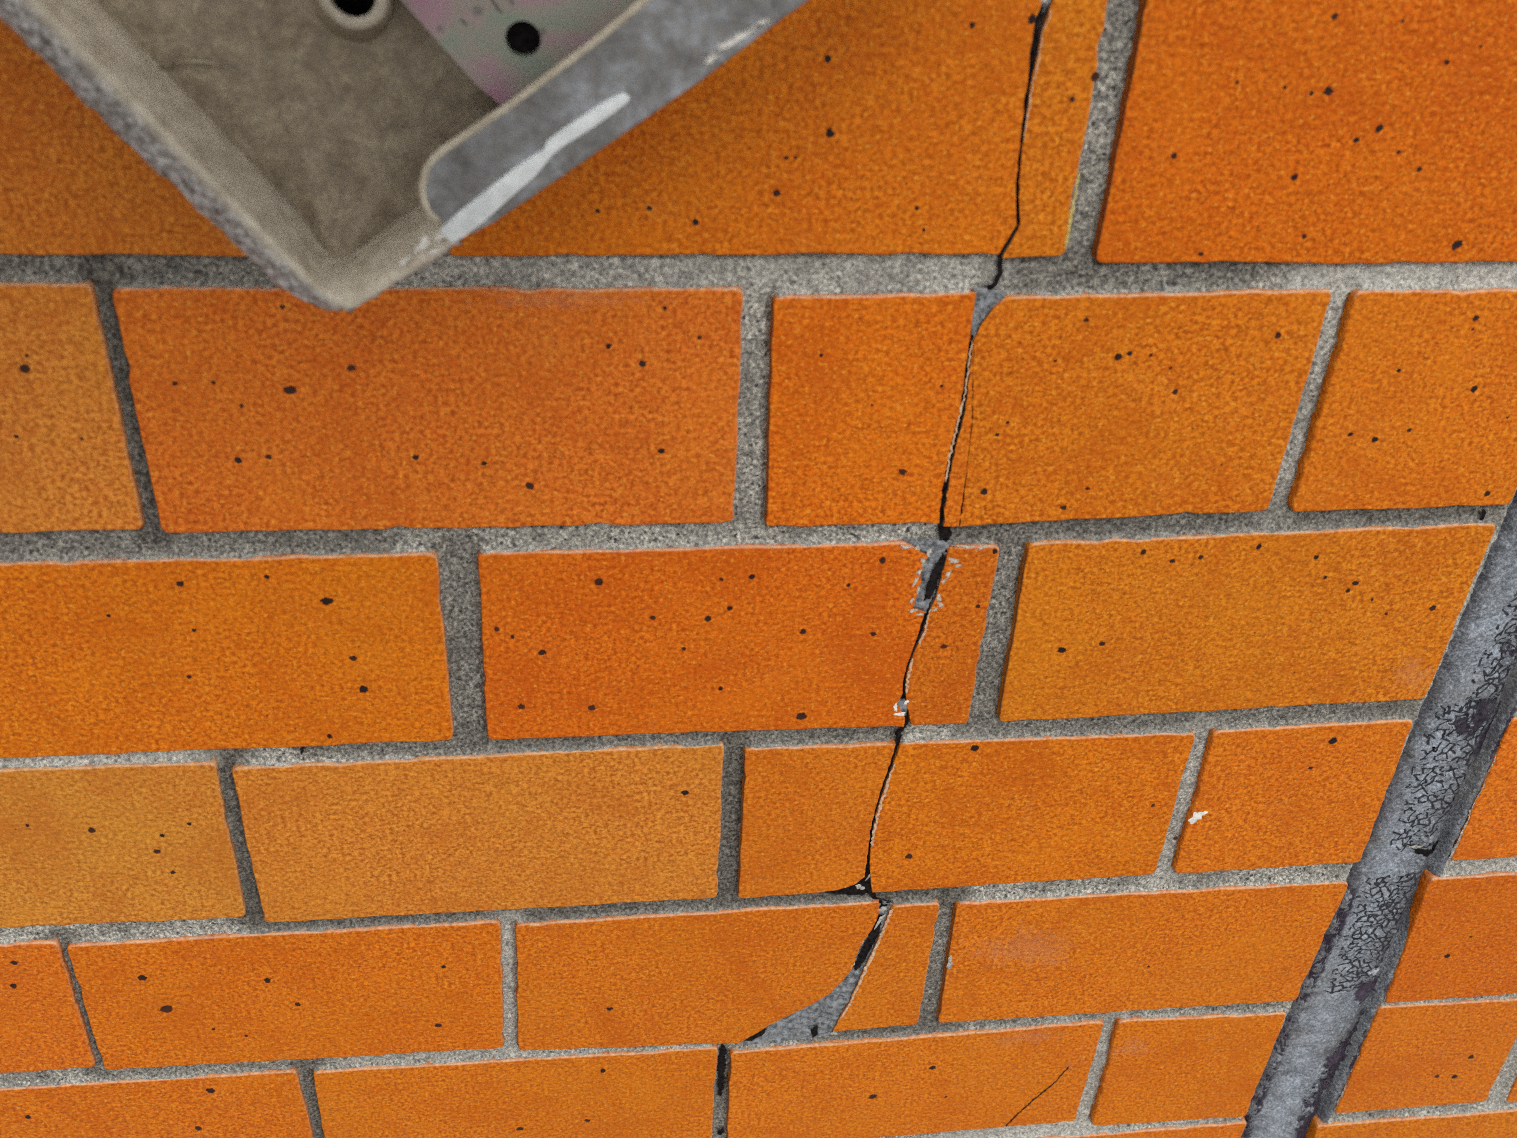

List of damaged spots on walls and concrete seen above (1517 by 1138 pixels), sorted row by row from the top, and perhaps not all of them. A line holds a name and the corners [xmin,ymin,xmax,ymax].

crack [982,6,1051,290]
crack [840,327,974,1019]
spalling [900,538,989,616]
spalling [735,874,893,1046]